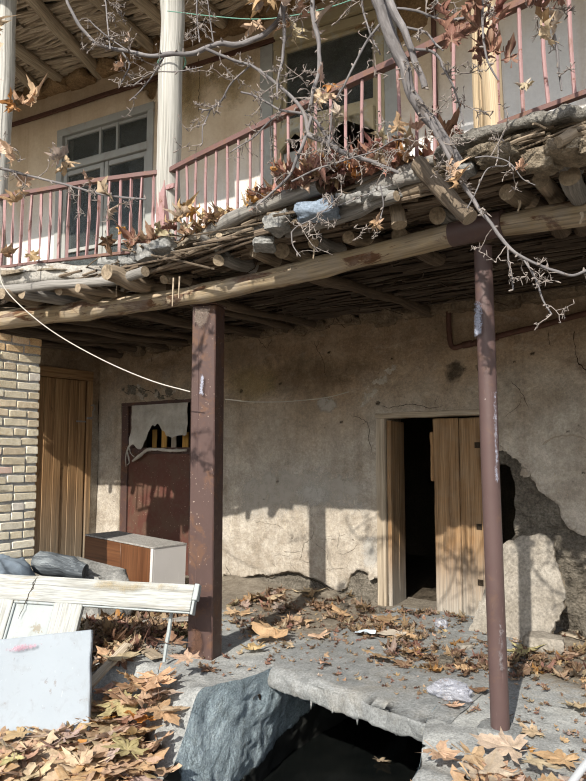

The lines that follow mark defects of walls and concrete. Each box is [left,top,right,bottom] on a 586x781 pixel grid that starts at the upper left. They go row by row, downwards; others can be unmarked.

flaking render [249,570,378,603]
flaking render [499,445,586,630]